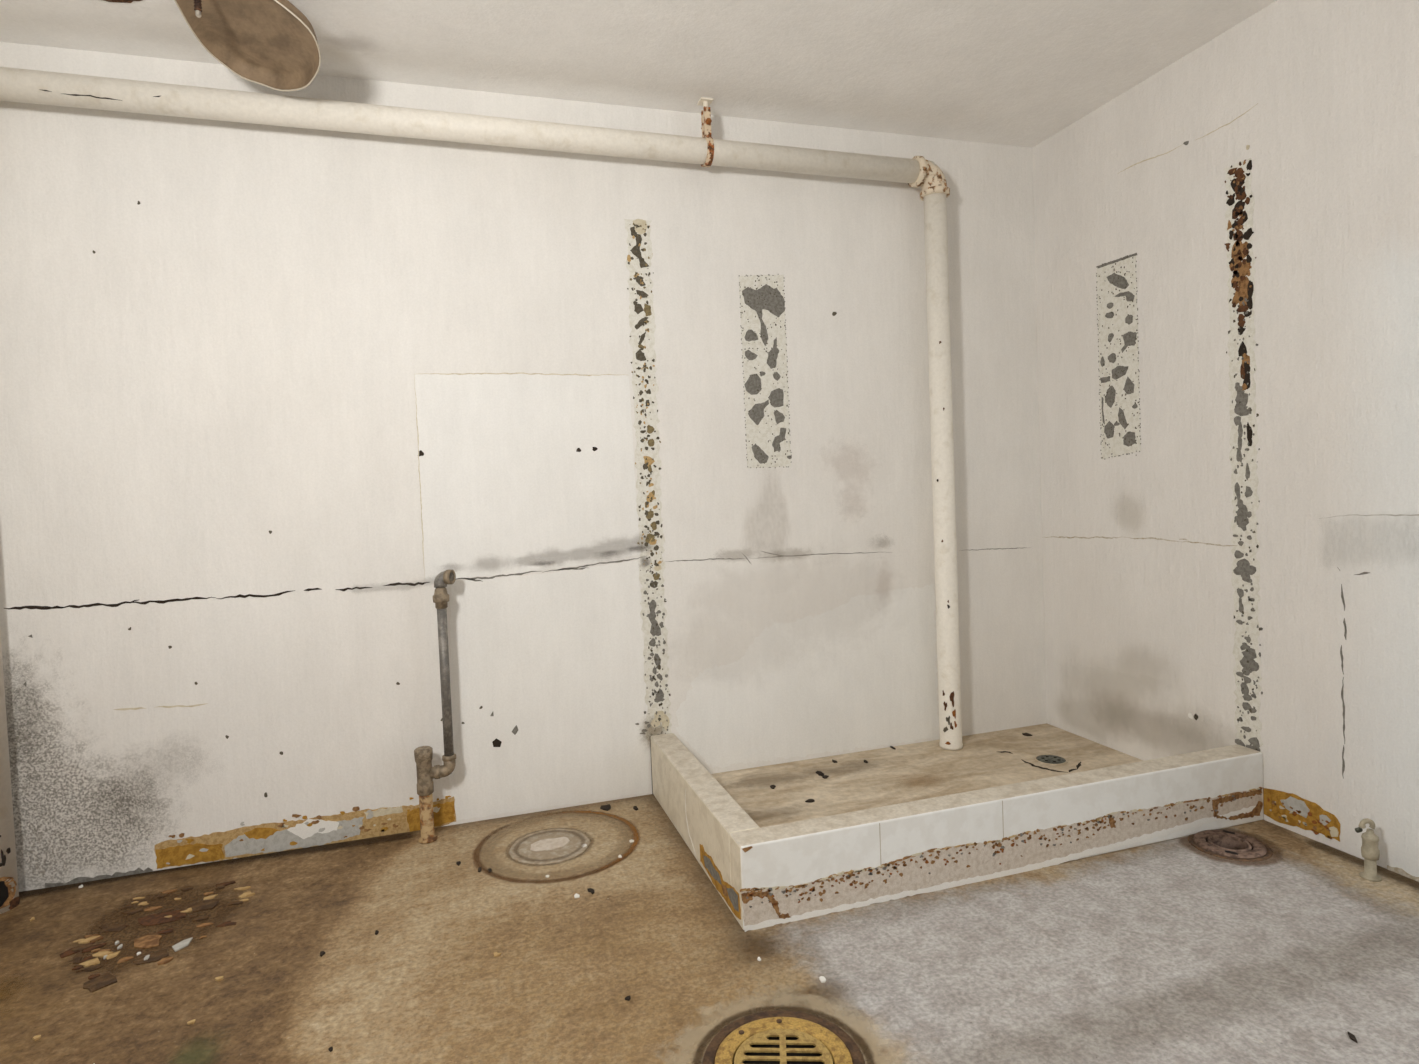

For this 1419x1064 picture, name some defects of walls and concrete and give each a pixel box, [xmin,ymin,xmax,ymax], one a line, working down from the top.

crack [4,551,892,610]
peeling [624,219,672,740]
peeling [739,274,792,468]
peeling [1096,253,1141,460]
peeling [1224,145,1264,769]
crack [1337,567,1370,779]
peeling [287,818,339,839]